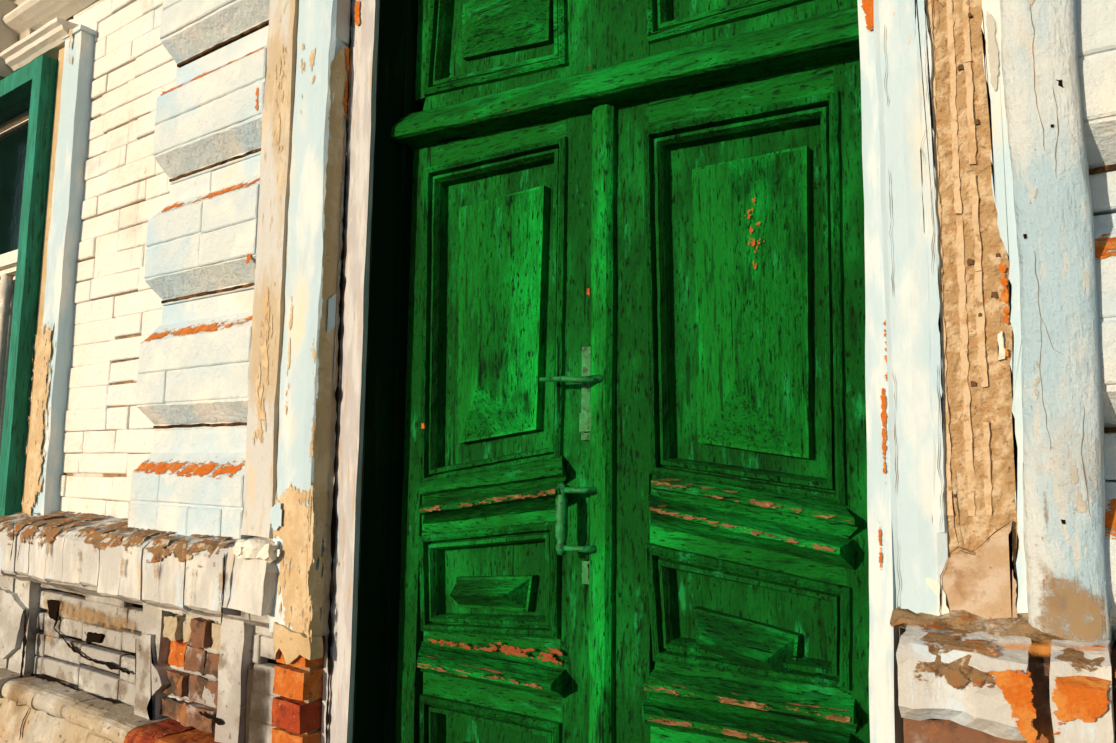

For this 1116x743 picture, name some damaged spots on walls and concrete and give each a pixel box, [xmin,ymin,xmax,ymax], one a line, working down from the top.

peeling [861,0,874,32]
peeling [1095,233,1116,260]
spalling [915,0,1040,613]
peeling [0,0,351,743]
peeling [1061,465,1087,524]
peeling [1105,499,1116,539]
spalling [912,624,1038,743]
peeling [1052,645,1116,735]